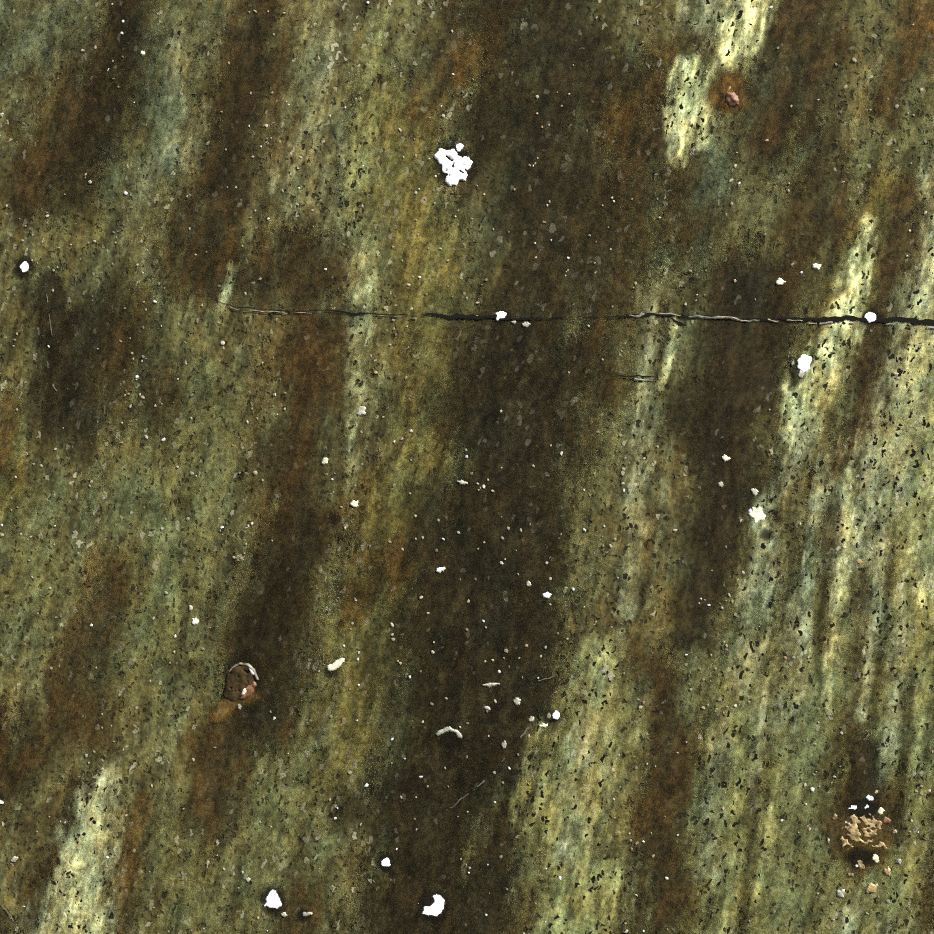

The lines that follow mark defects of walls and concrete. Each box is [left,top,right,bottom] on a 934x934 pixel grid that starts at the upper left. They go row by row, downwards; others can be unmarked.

leakage [670,61,715,157]
rust [707,70,746,111]
leakage [701,0,849,162]
crack [202,299,934,330]
leakage [165,0,646,934]
leakage [627,143,934,934]